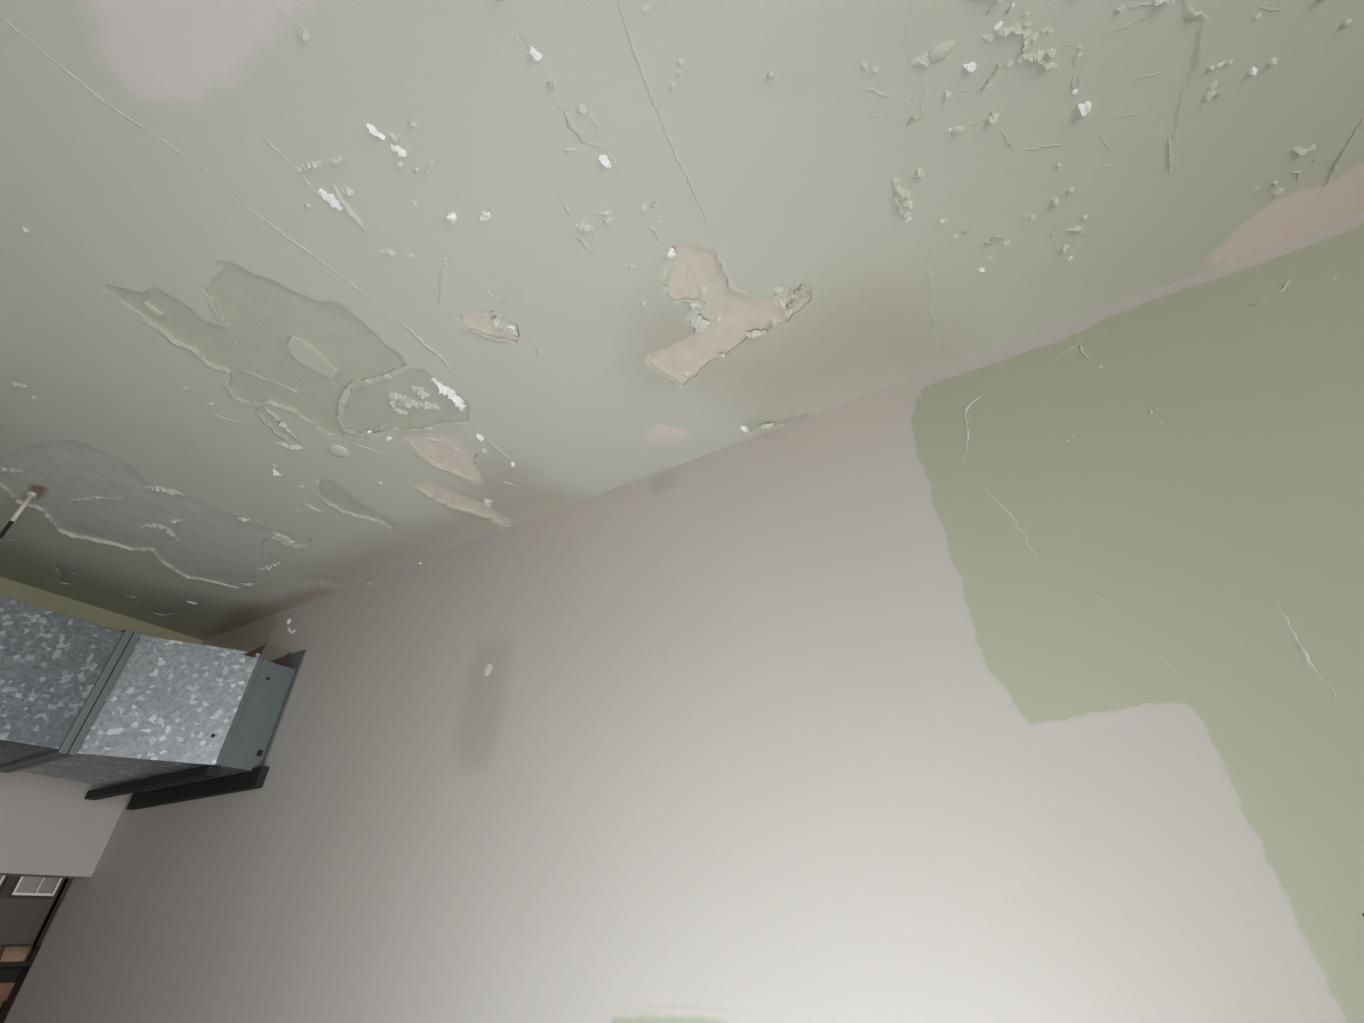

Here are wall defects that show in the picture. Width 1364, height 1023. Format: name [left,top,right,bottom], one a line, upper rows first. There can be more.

crack [0,15,452,374]
peeling [262,136,365,232]
peeling [366,121,459,224]
peeling [547,79,623,176]
crack [617,0,751,298]
peeling [944,0,1091,117]
crack [1089,0,1209,174]
peeling [640,201,812,390]
peeling [101,258,519,530]
peeling [0,440,313,590]
damp [439,621,527,799]
crack [1277,606,1336,700]